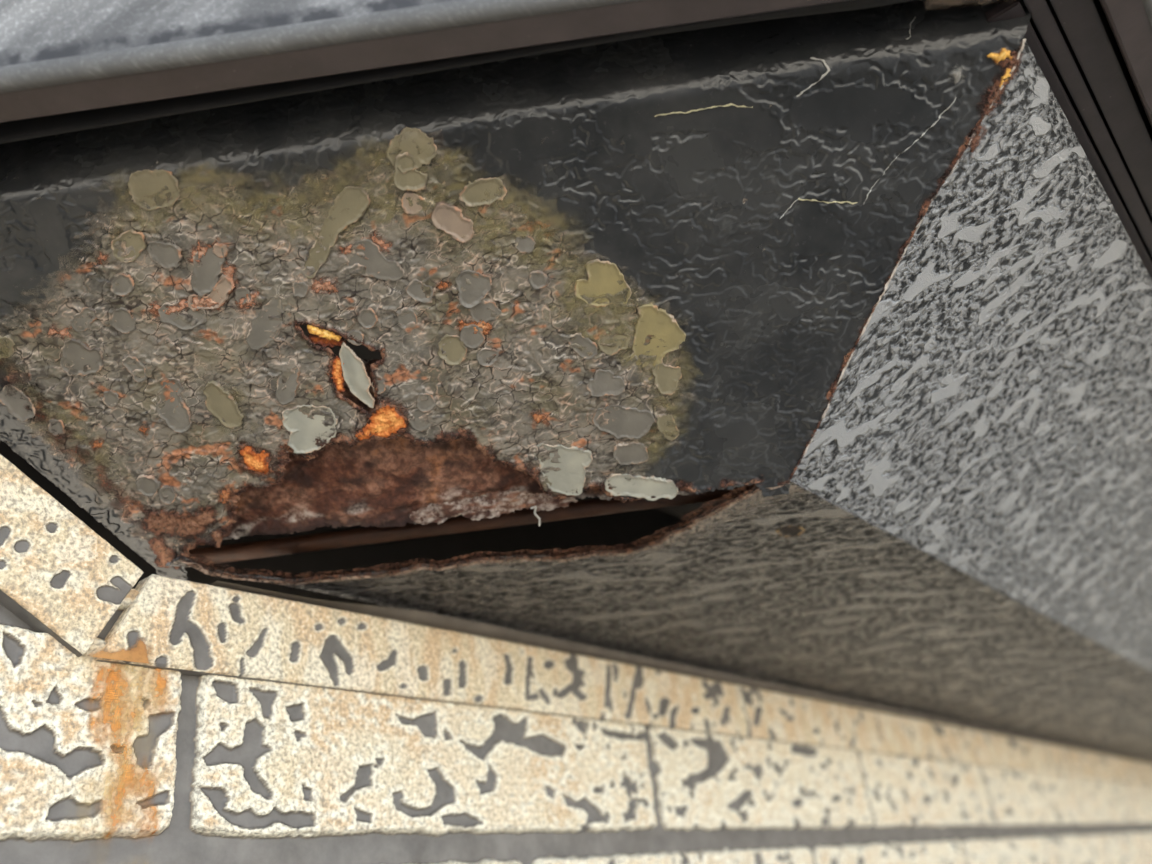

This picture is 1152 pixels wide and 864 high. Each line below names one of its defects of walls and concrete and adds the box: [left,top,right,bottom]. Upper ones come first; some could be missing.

rust [307,325,347,393]
peeling [0,127,692,570]
rust [351,397,410,442]
rust [236,442,274,480]
rust [91,640,166,837]